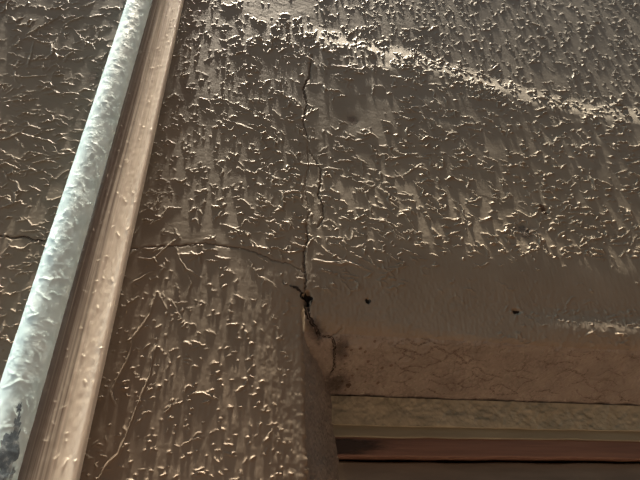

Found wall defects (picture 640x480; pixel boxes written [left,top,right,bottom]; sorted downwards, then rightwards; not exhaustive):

crack [130,57,341,375]
crack [391,338,635,402]